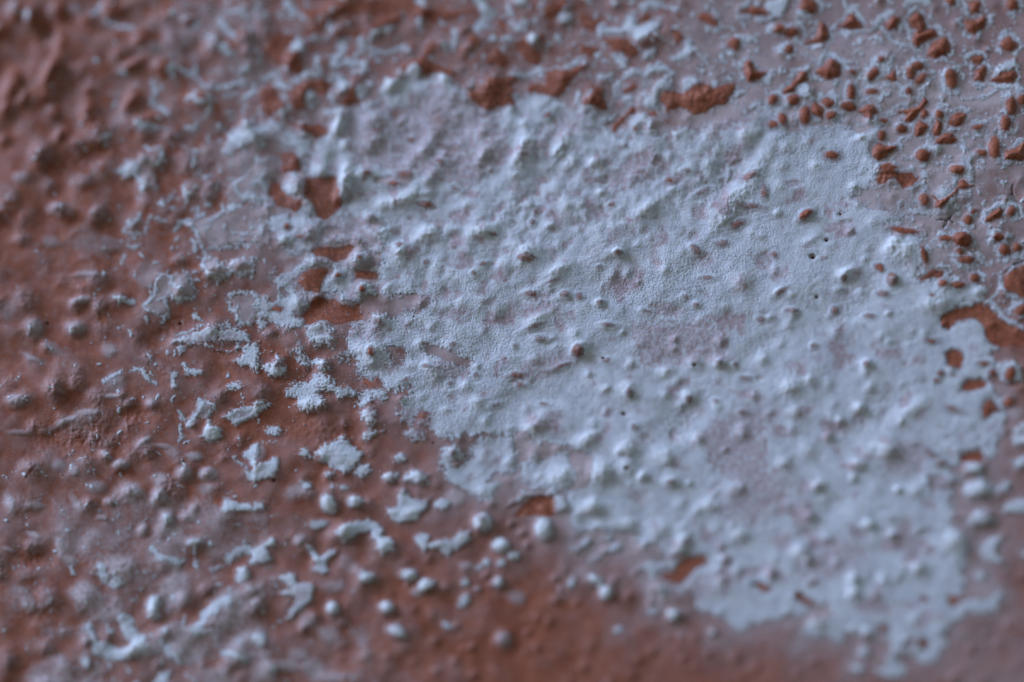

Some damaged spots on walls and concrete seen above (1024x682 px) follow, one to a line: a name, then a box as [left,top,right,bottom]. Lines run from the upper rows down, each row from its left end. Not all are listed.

peeling [876,167,917,188]
peeling [304,176,342,220]
peeling [312,245,353,262]
peeling [302,296,363,325]
peeling [941,303,1024,347]
peeling [946,350,965,369]
peeling [963,379,986,391]
peeling [663,556,706,583]